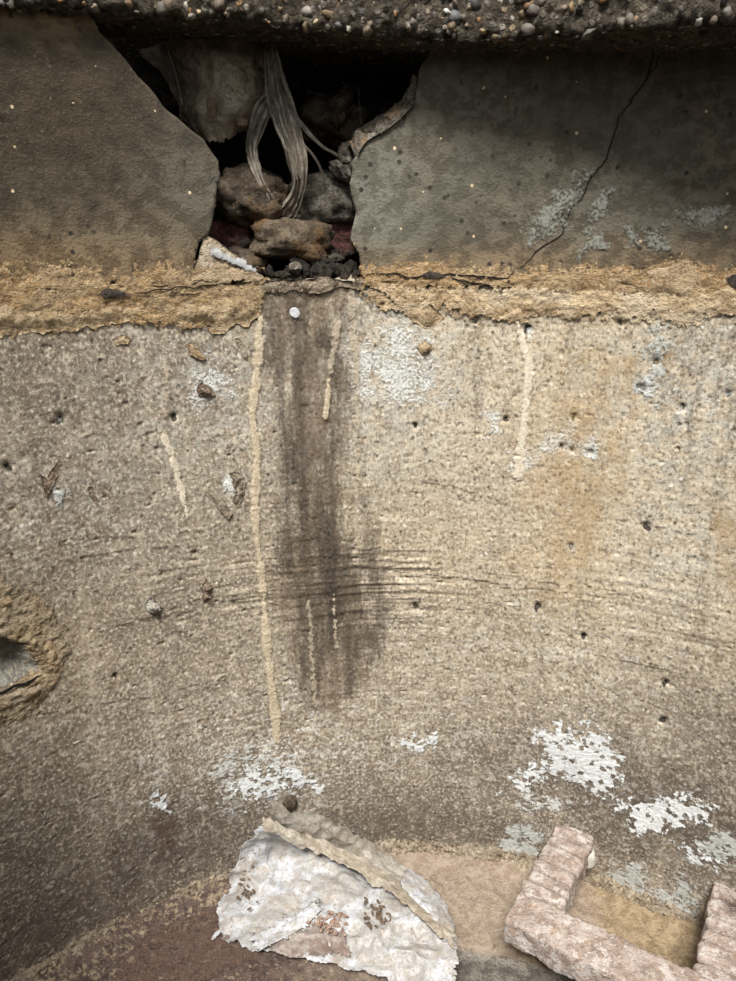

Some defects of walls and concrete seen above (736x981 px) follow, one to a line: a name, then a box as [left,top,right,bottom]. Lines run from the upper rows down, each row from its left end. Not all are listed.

crack [364,51,664,304]
spalling [0,574,73,728]
water stain [198,289,461,817]
water stain [492,708,736,874]